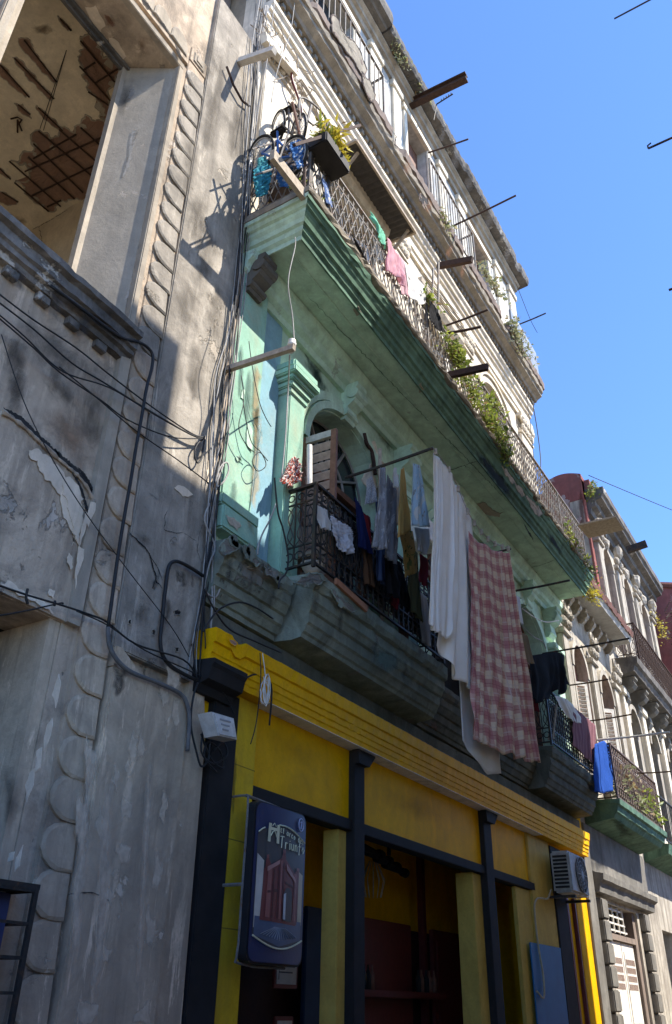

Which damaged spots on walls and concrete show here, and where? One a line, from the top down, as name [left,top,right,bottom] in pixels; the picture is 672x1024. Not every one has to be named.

spalling [14,40,57,100]
peeling [60,6,126,117]
spalling [0,64,101,212]
peeling [29,448,96,589]
peeling [174,485,193,497]